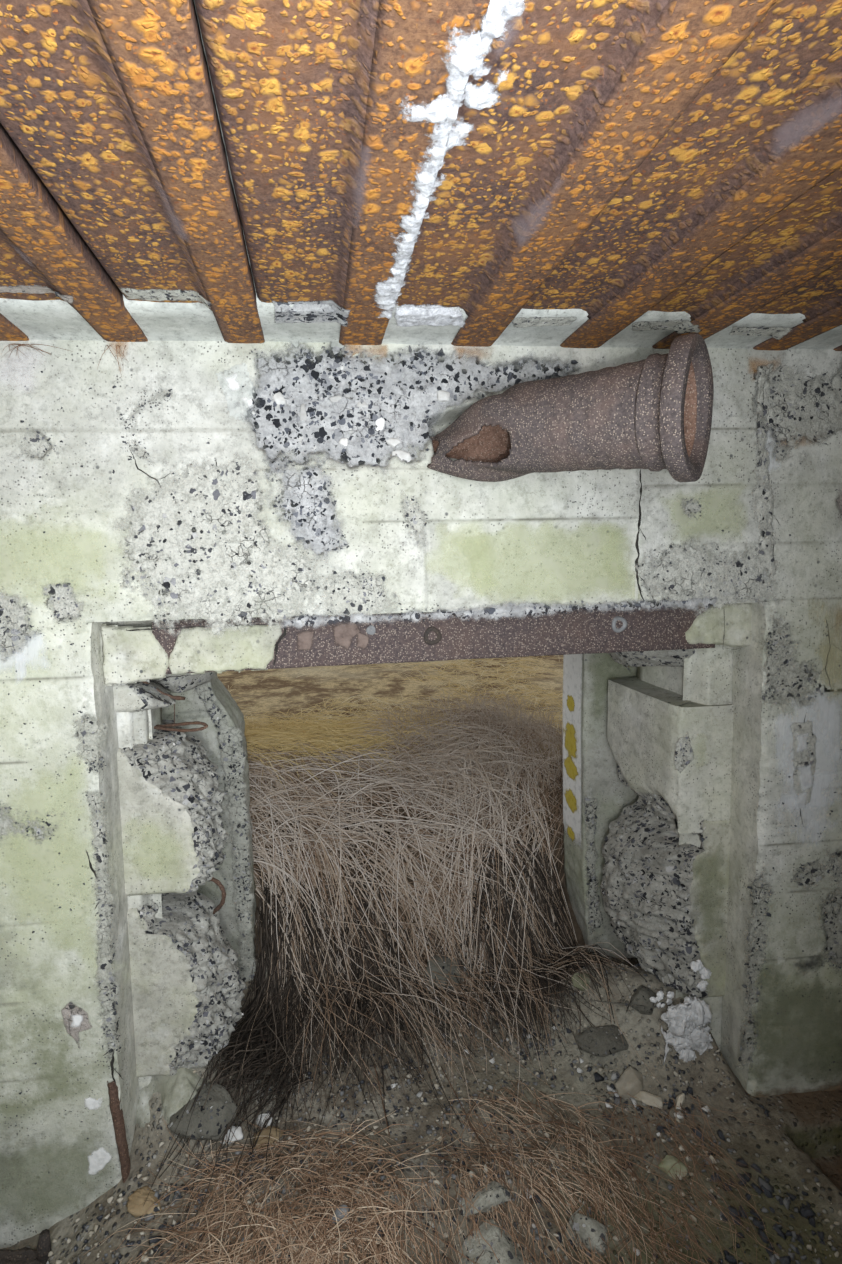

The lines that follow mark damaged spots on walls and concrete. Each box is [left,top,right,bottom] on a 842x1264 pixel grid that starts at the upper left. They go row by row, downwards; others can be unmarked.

leakage [375,0,525,327]
spalling [272,300,350,326]
spalling [512,317,576,328]
spalling [632,319,701,334]
spalling [729,326,791,340]
spalling [754,366,842,461]
spalling [105,344,819,707]
crack [819,620,842,687]
spalling [172,683,256,1066]
spalling [584,794,673,980]